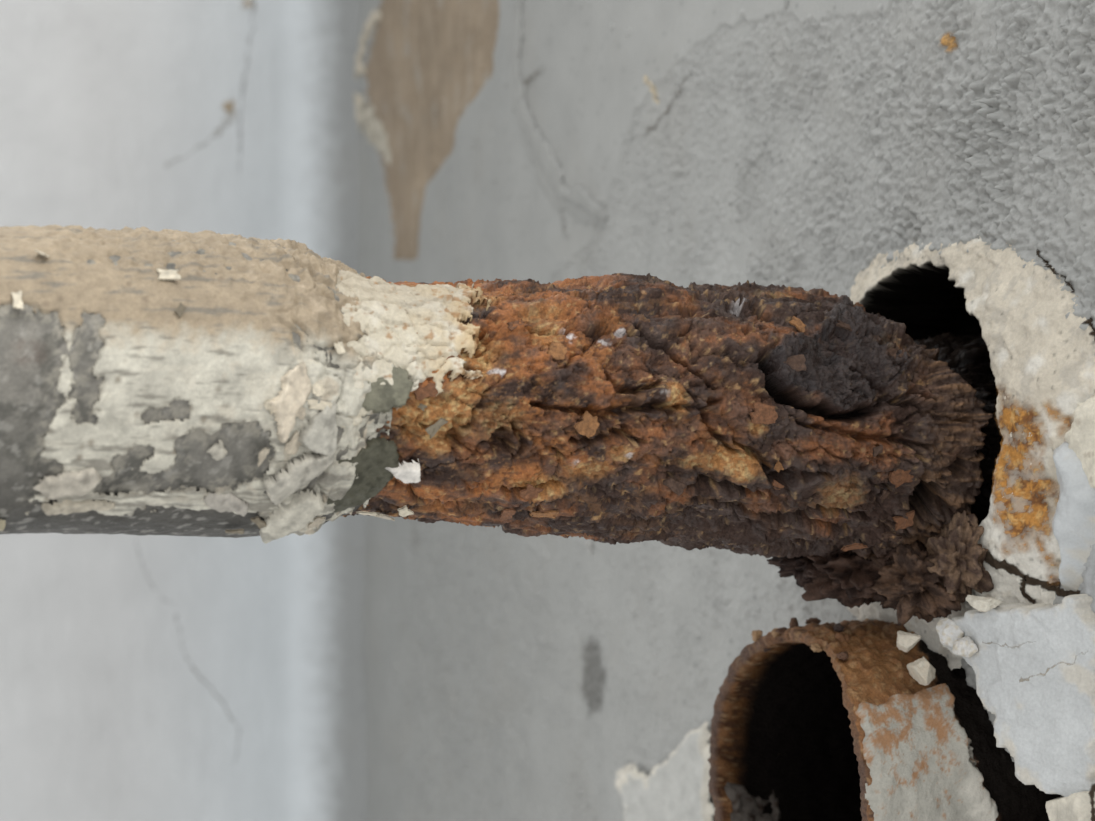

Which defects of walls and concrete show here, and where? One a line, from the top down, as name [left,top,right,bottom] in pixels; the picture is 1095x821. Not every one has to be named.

crack [642,72,691,137]
peeling [354,0,500,261]
peeling [157,269,181,280]
peeling [11,291,24,310]
peeling [333,341,346,354]
corrosion [413,382,438,400]
corrosion [573,411,600,438]
corrosion [749,402,778,425]
peeling [203,362,427,544]
peeling [33,468,116,516]
corrosion [993,390,1072,581]
corrosion [751,617,821,652]